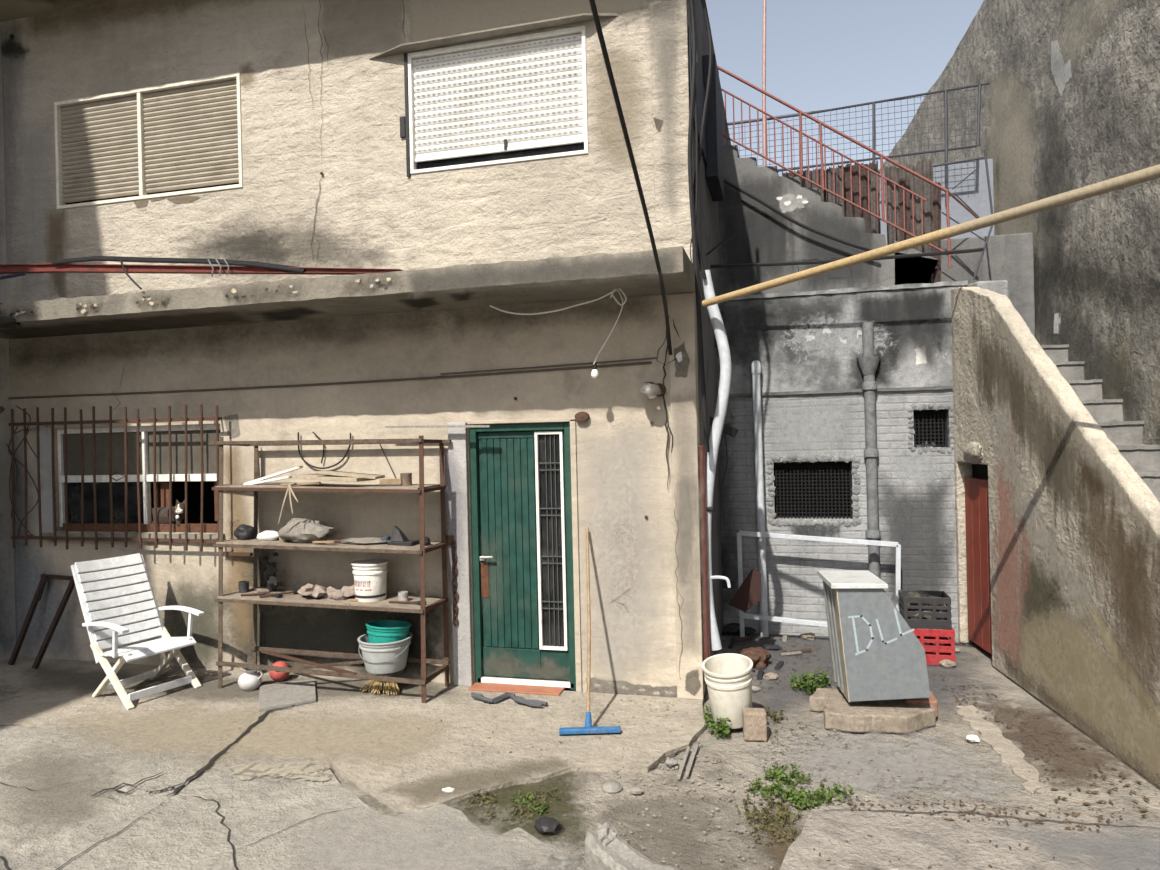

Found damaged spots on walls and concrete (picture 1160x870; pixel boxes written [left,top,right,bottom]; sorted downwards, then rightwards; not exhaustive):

peeling [1050,40,1072,96]
damp [807,213,871,283]
damp [855,295,941,387]
damp [1034,258,1160,401]
damp [973,325,1160,689]
peeling [996,467,1160,779]
crack [0,705,361,870]
damp [982,663,1131,786]